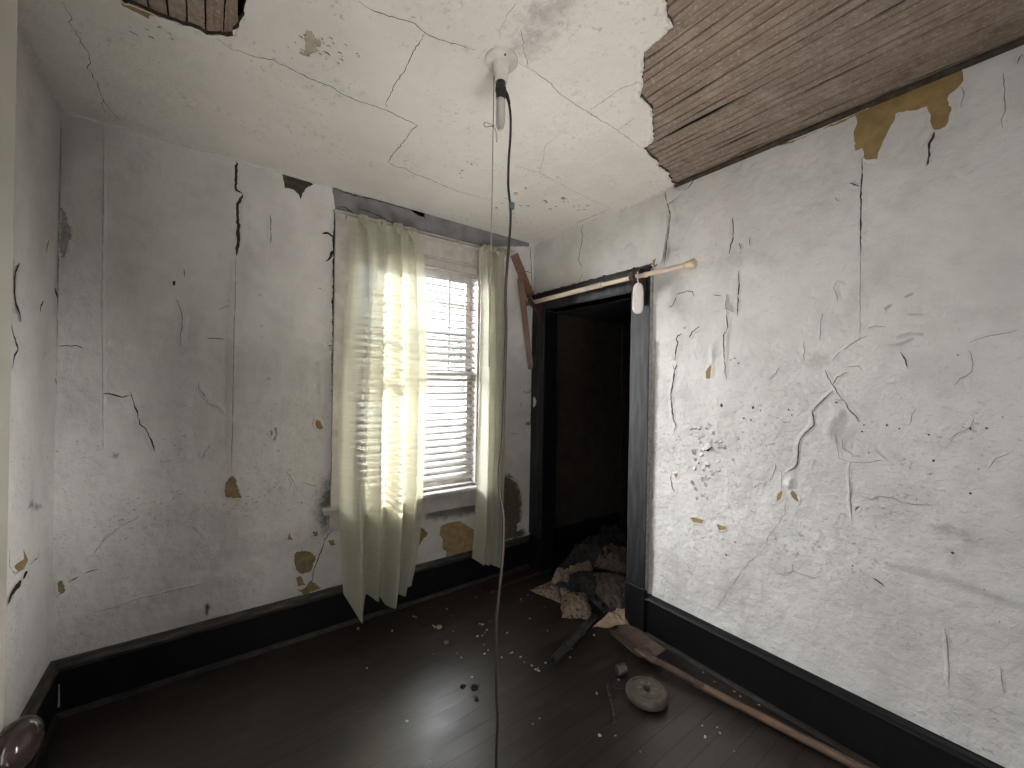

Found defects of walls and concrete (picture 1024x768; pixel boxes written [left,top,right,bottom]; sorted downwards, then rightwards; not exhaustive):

flaking render [121,0,248,46]
crack [216,0,490,200]
crack [500,4,641,148]
peeling [674,36,1024,188]
peeling [279,173,316,203]
crack [198,194,243,475]
crack [709,165,887,616]
peeling [221,474,244,501]
peeling [285,529,338,596]
peeling [419,519,474,557]
water stain [504,474,525,540]
peeling [672,423,747,500]